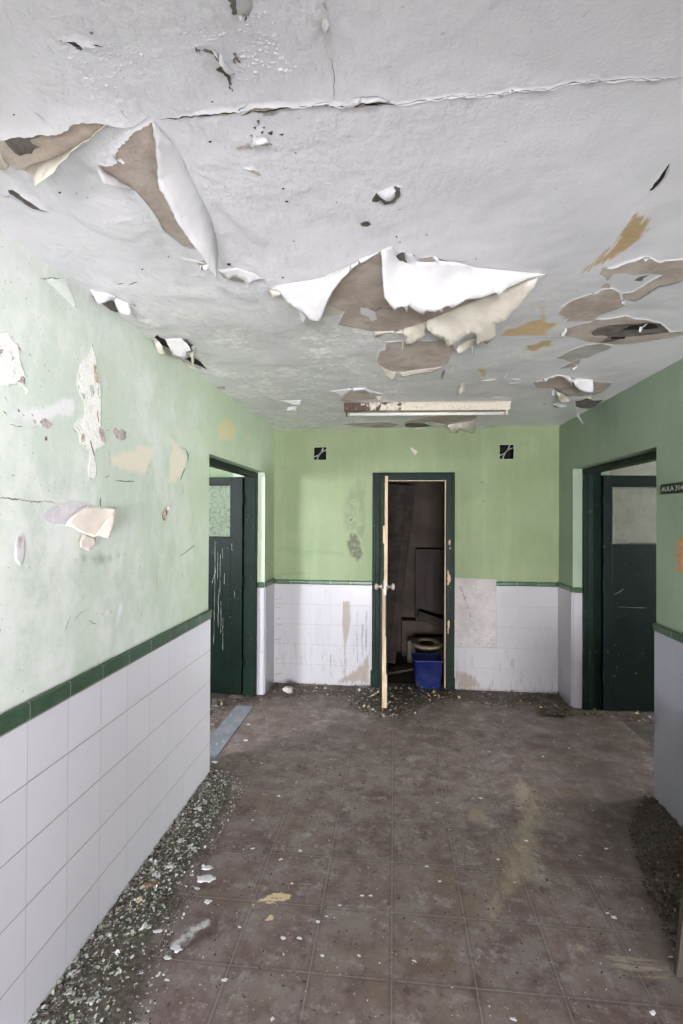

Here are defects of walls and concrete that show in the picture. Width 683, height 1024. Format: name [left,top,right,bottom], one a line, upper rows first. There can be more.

peeling [228,0,253,23]
peeling [195,47,241,91]
crack [159,75,683,120]
peeling [0,92,547,381]
damp [575,205,666,278]
spalling [0,330,28,394]
peeling [533,256,683,424]
peeling [73,343,189,487]